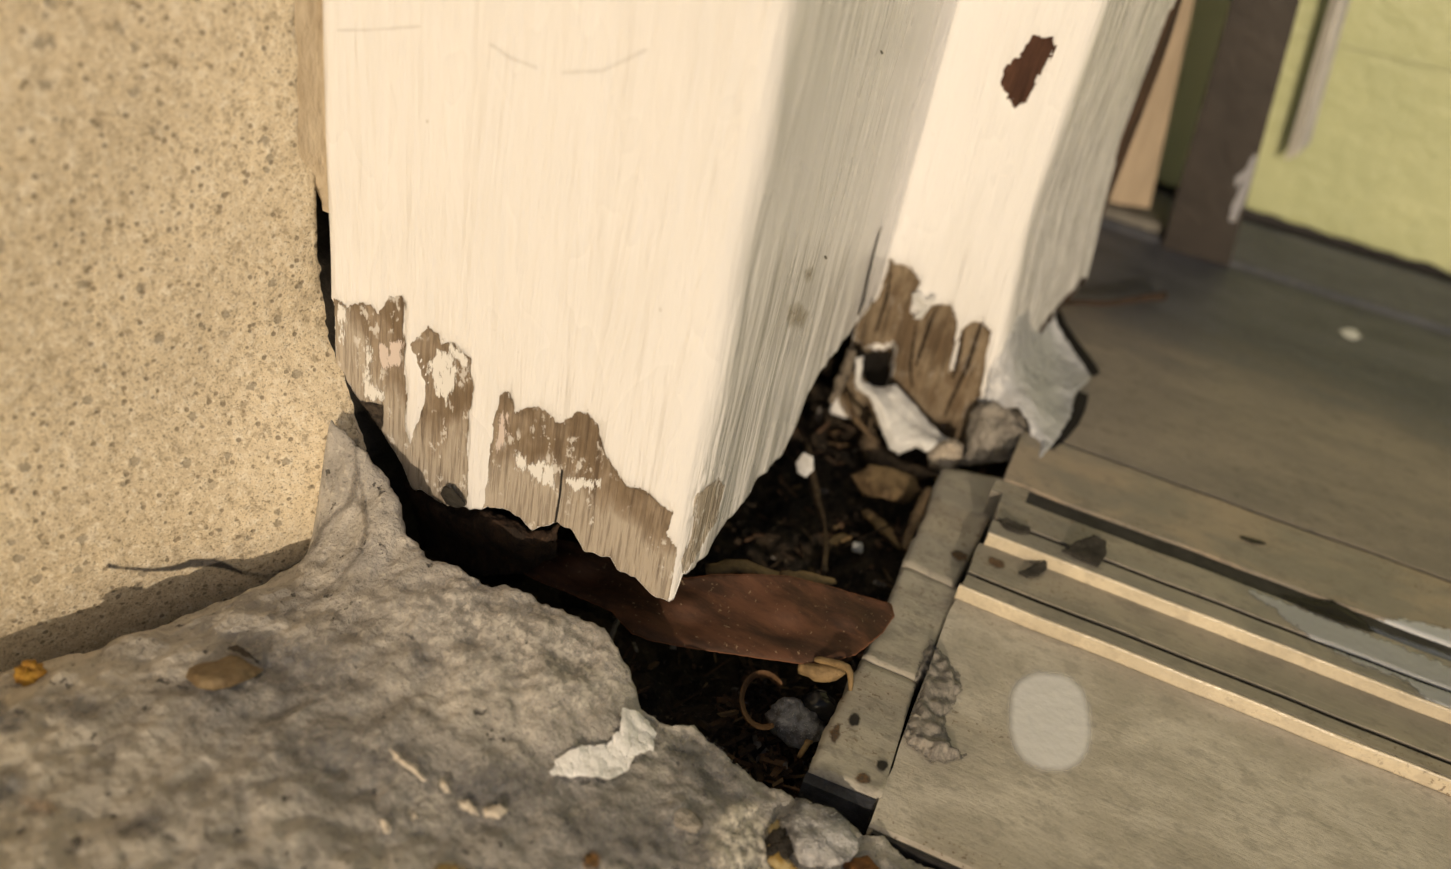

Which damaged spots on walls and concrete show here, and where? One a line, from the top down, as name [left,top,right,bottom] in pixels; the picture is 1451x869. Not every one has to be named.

peeling [1001,35,1057,109]
peeling [333,295,725,600]
peeling [838,258,991,451]
crack [108,559,242,574]